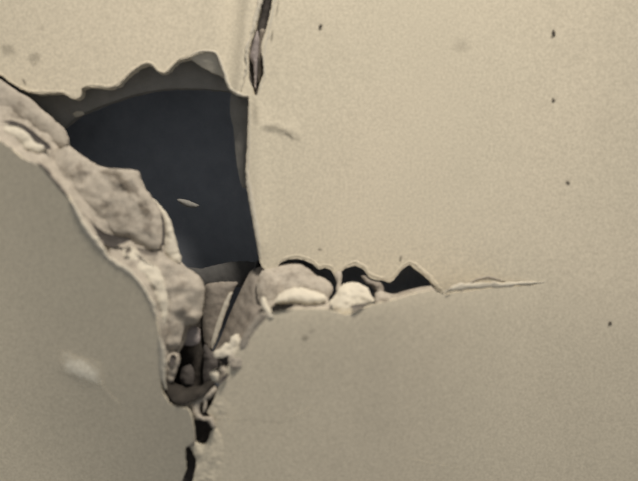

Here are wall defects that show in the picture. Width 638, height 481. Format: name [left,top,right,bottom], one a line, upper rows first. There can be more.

crack [241,0,276,95]
spalling [0,50,270,405]
crack [240,254,544,350]